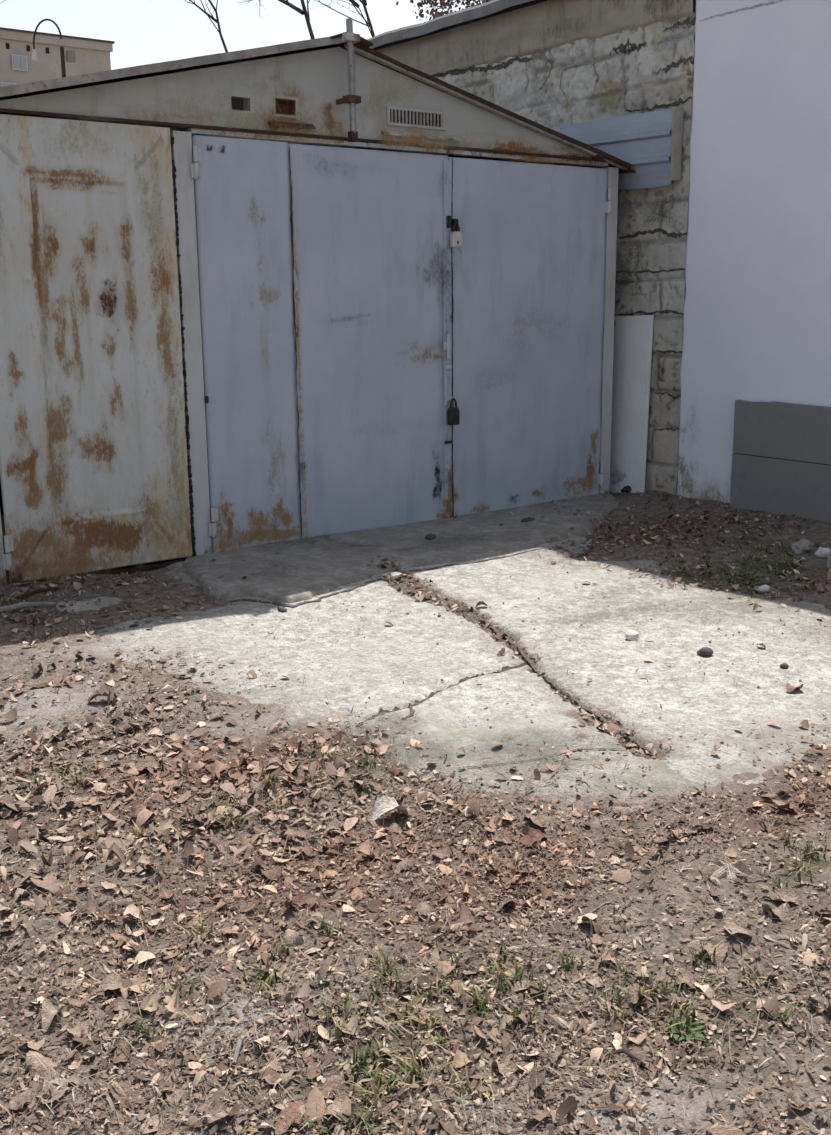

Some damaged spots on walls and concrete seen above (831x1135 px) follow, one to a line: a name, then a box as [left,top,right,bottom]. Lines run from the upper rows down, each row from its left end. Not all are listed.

rust [9,351,23,395]
rust [26,167,138,378]
rust [4,395,165,581]
rust [151,160,197,557]
rust [215,499,306,550]
rust [565,432,598,495]
crack [230,547,664,768]